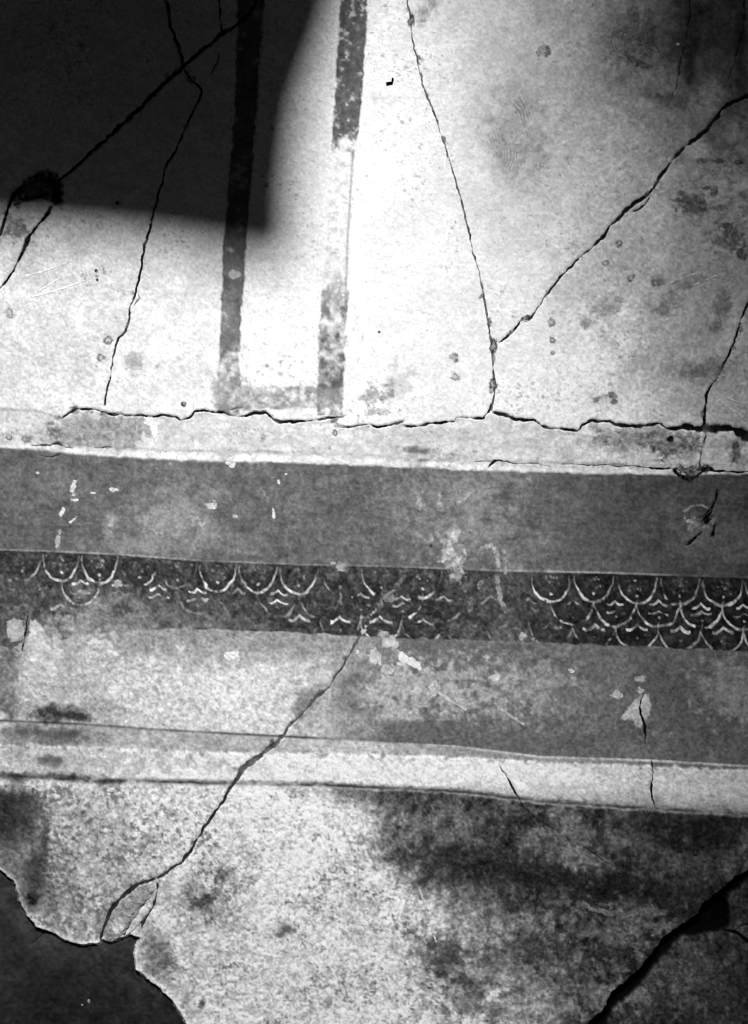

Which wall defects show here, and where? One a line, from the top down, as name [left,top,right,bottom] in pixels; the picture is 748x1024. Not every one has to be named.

crack [0,0,748,545]
crack [99,604,376,940]
crack [639,677,655,804]
flaking render [0,866,190,1024]
crack [588,871,748,1024]